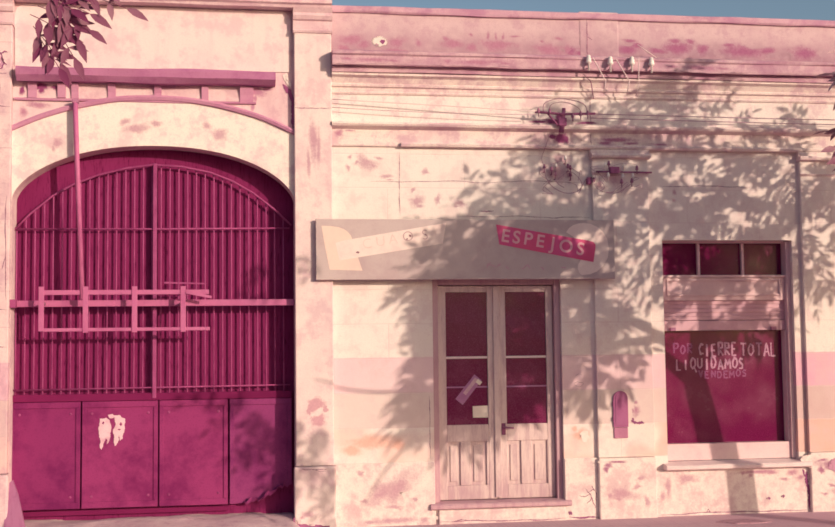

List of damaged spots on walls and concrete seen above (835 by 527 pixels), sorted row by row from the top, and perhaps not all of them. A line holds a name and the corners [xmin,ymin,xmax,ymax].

water stain [331,29,580,67]
water stain [618,37,826,74]
peeling [303,392,332,429]
crack [453,486,597,522]